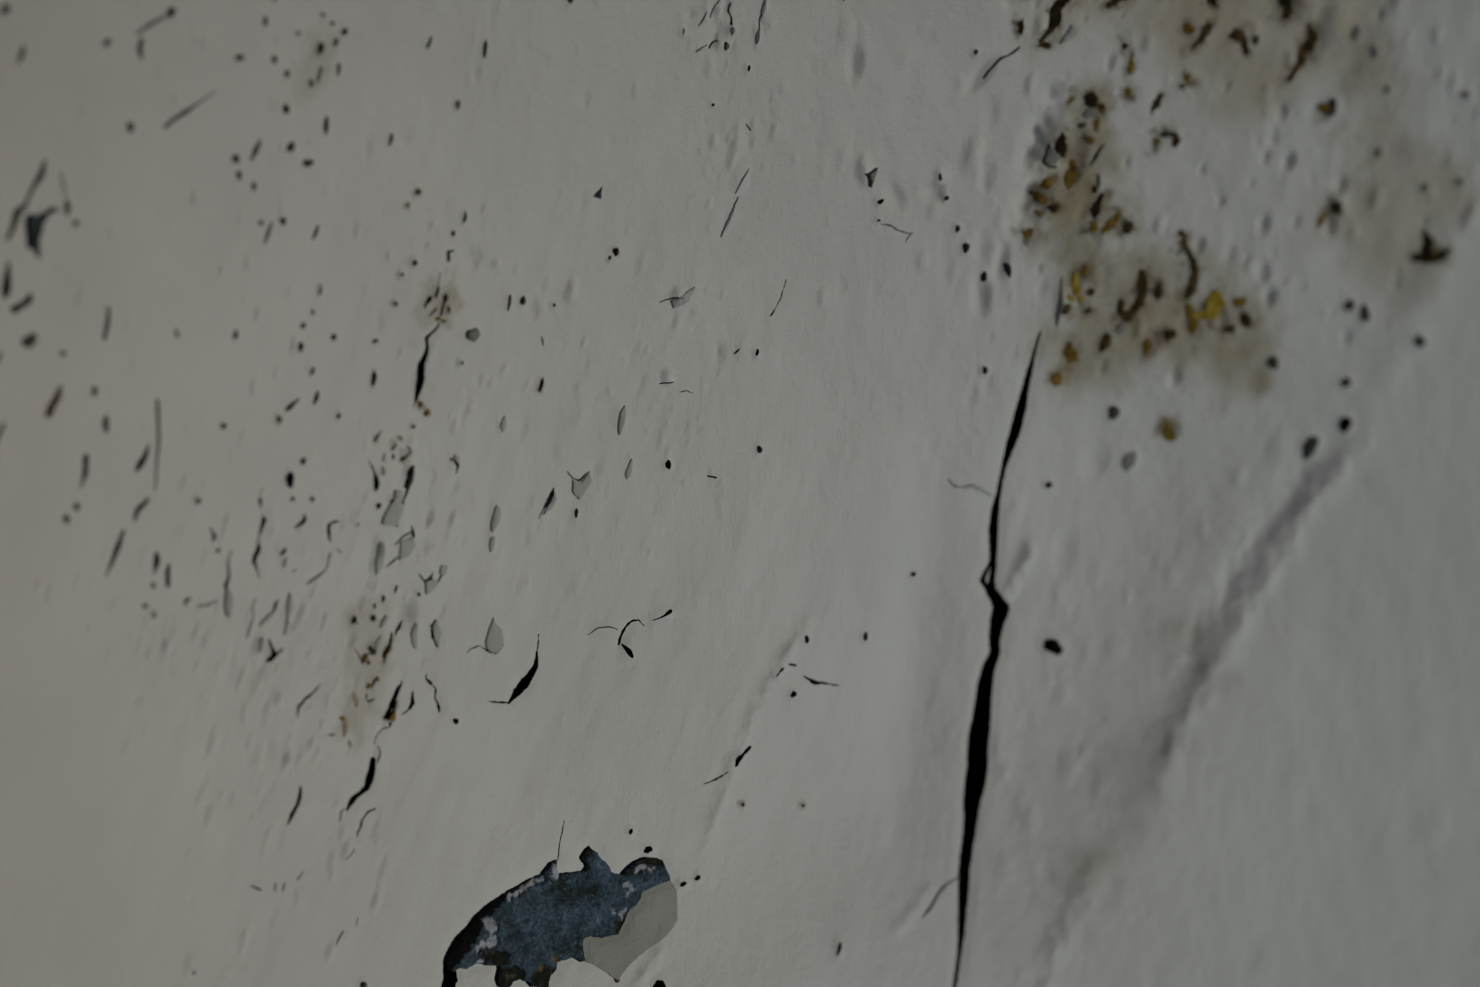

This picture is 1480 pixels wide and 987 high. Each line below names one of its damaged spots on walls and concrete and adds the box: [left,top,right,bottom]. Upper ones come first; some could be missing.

water stain [1017,0,1070,49]
water stain [1177,0,1260,56]
water stain [1277,0,1319,82]
peeling [2,260,33,314]
peeling [6,159,79,259]
water stain [1021,92,1135,251]
water stain [1099,230,1253,358]
water stain [1411,229,1451,264]
peeling [105,399,160,577]
peeling [374,490,416,575]
crack [921,329,1042,987]
peeling [441,821,678,987]